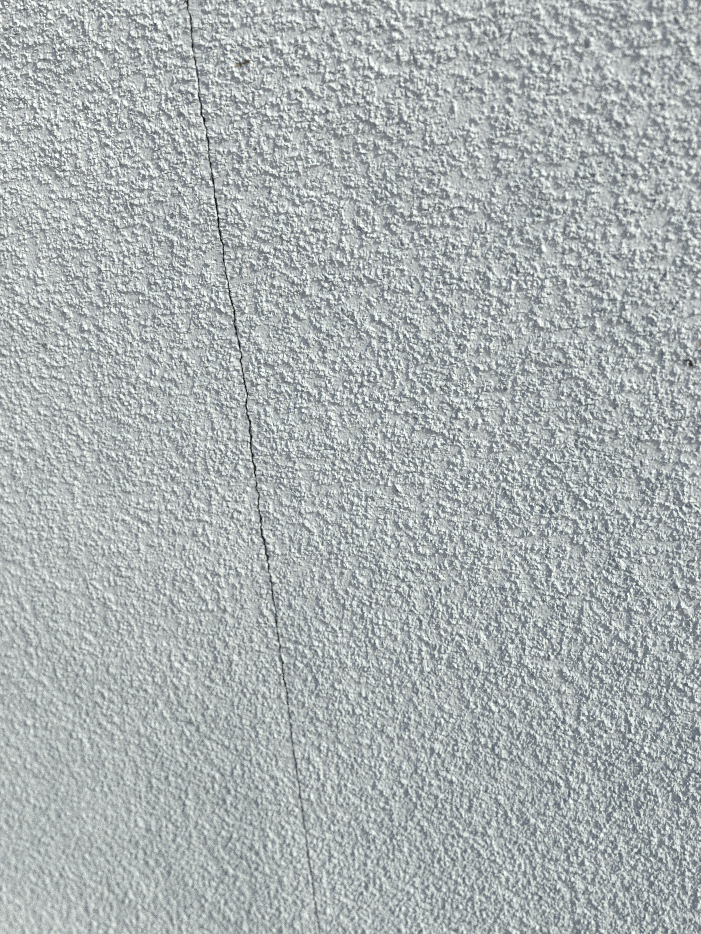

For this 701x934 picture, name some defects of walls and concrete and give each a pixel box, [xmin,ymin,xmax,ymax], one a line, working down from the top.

crack [183,0,320,934]